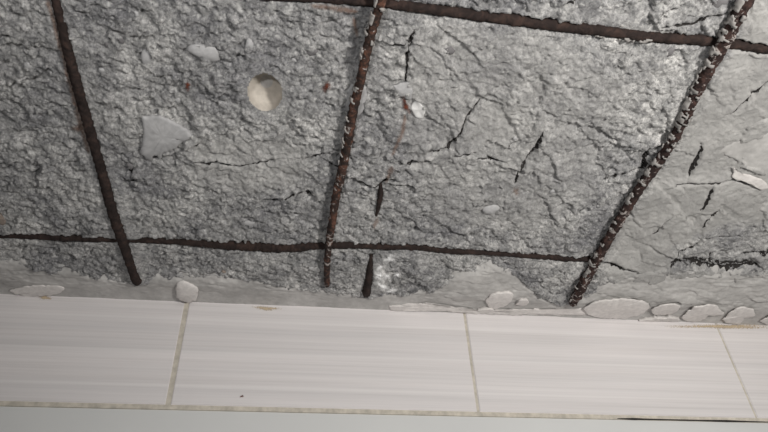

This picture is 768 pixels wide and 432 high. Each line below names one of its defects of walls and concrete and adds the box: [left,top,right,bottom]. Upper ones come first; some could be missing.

crack [392,32,414,82]
crack [664,8,726,28]
spalling [0,0,768,325]
crack [358,99,544,188]
crack [605,148,654,179]
crack [670,145,768,271]